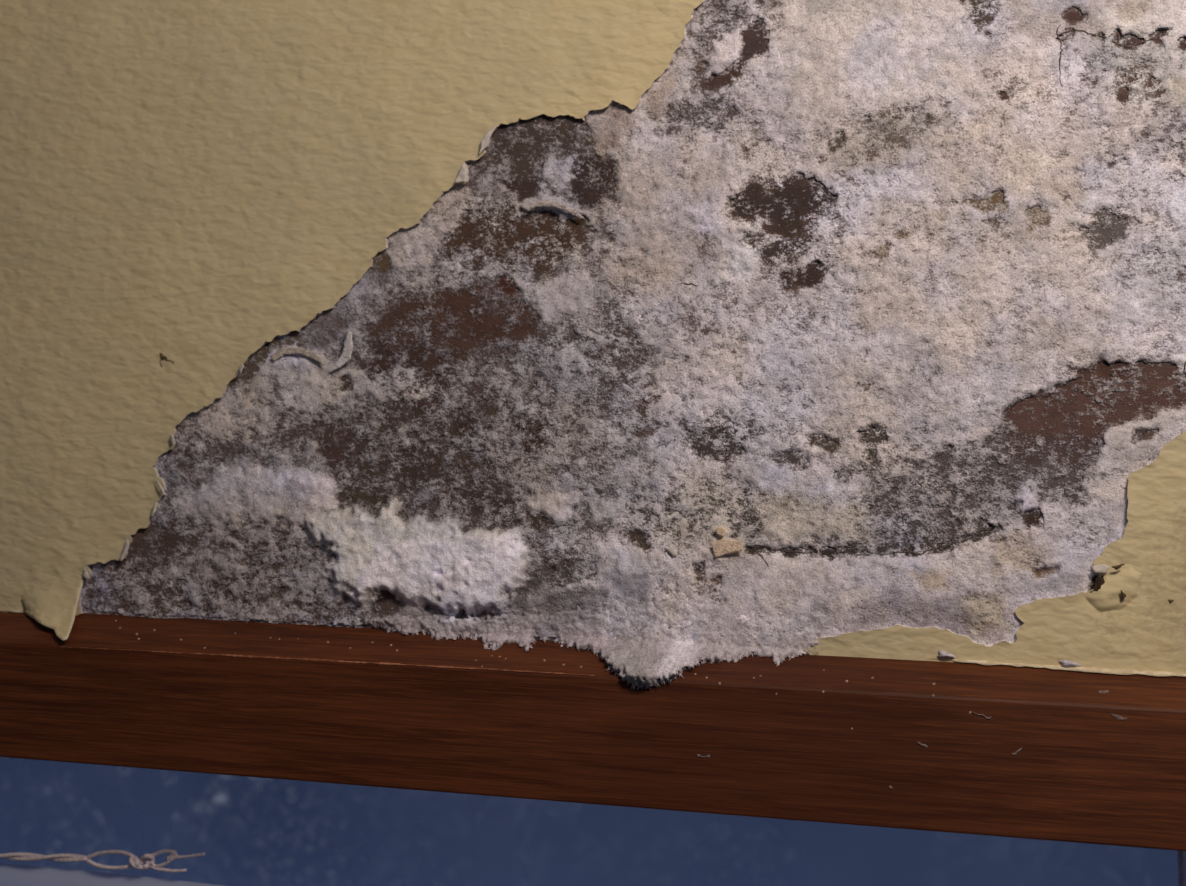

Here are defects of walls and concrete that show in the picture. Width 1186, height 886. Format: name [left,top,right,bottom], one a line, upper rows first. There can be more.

peeling [665,4,770,134]
peeling [1056,8,1088,46]
peeling [1115,69,1158,105]
peeling [1098,28,1186,52]
peeling [730,173,837,289]
peeling [1079,209,1128,245]
peeling [227,193,604,528]
water stain [81,0,1186,690]
peeling [690,422,749,460]
peeling [778,361,1186,560]
peeling [21,477,399,641]
peeling [711,526,763,558]